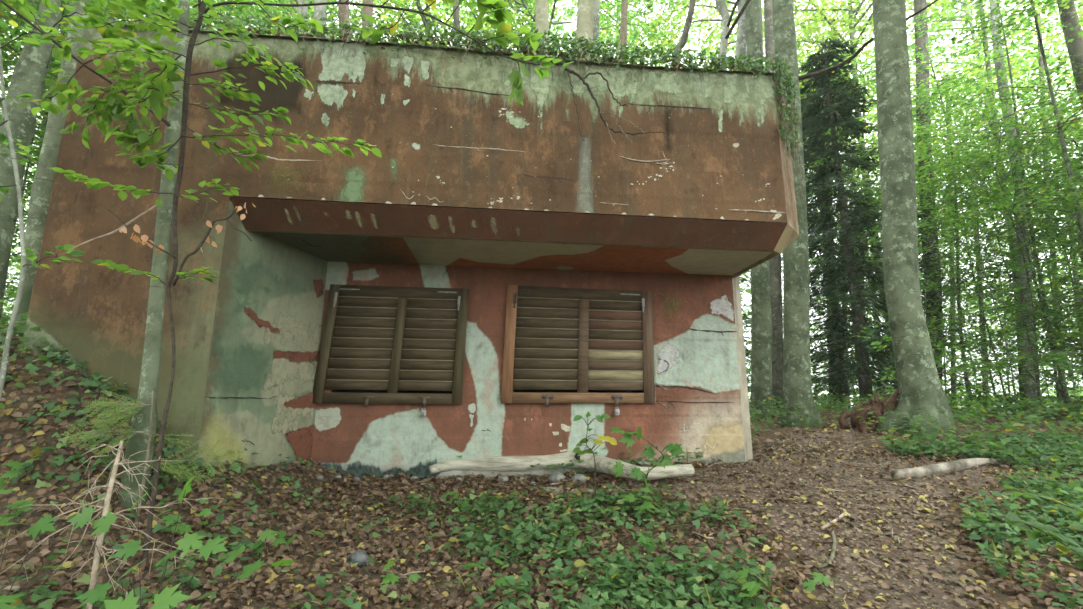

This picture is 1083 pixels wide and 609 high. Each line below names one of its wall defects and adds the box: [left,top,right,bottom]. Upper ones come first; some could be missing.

peeling [304,38,366,126]
peeling [499,60,775,132]
crack [628,103,709,113]
peeling [244,307,280,334]
spalling [711,295,734,321]
peeling [274,351,319,363]
spalling [657,344,679,374]
peeling [284,392,316,409]
peeling [468,403,476,427]
peeling [286,425,314,461]